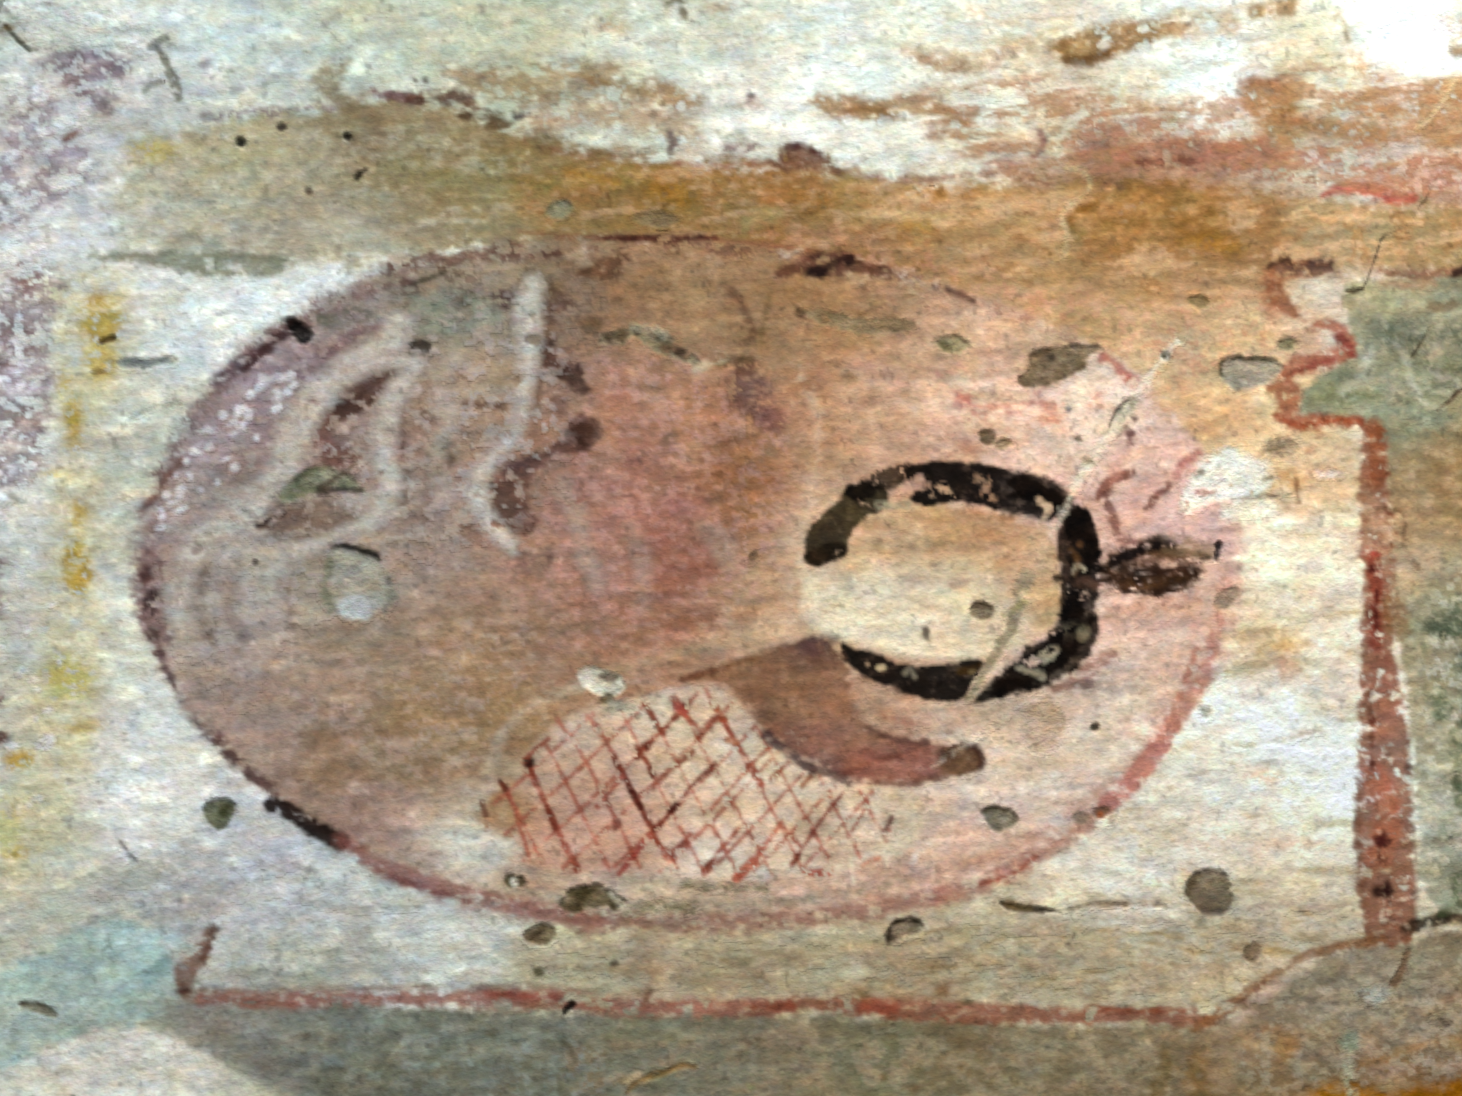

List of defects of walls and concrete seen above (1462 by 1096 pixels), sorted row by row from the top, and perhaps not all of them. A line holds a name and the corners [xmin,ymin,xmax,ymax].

flaking render [1015,341,1105,415]
flaking render [1215,335,1302,397]
spalling [1070,433,1084,445]
flaking render [316,540,399,624]
peeling [1097,866,1369,968]